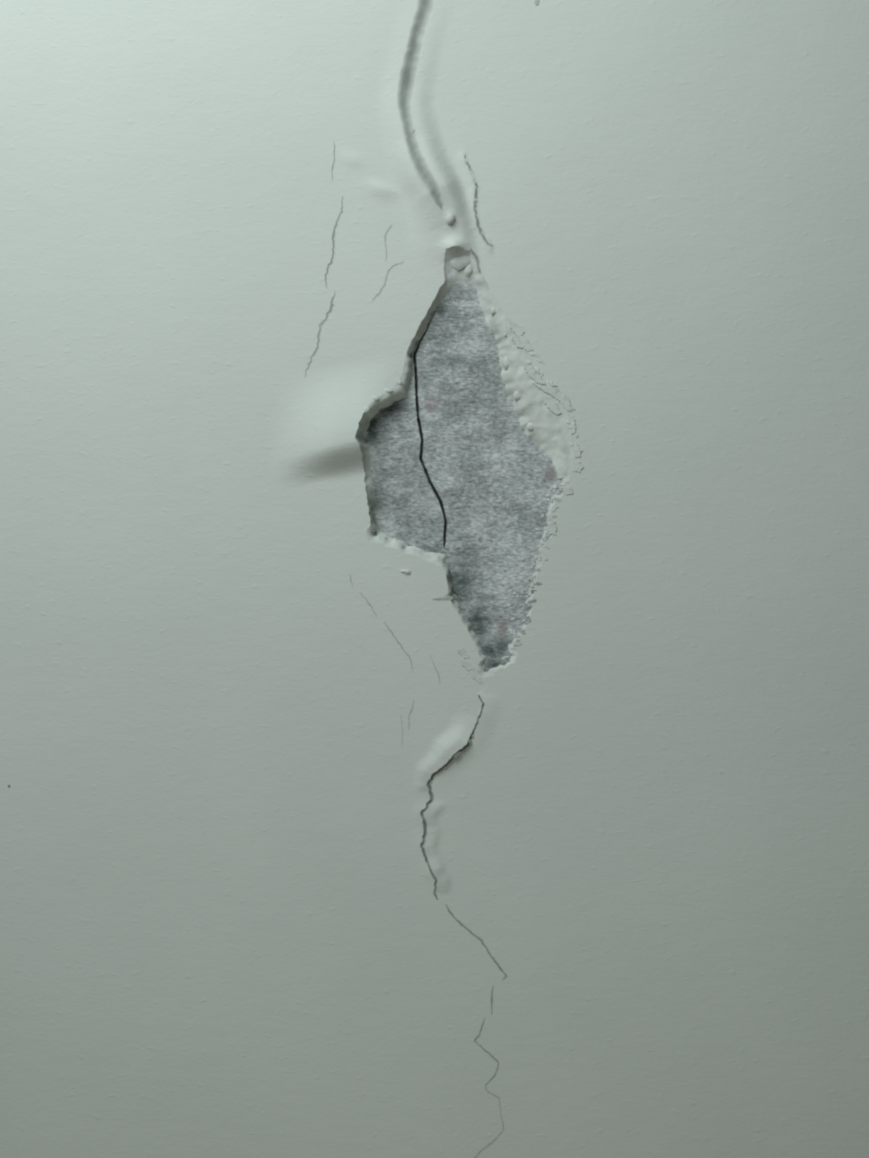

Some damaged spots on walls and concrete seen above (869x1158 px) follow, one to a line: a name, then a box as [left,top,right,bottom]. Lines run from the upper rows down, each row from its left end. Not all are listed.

crack [305,144,343,376]
crack [396,0,444,210]
crack [464,155,493,271]
spalling [355,246,576,679]
crack [420,695,508,1158]